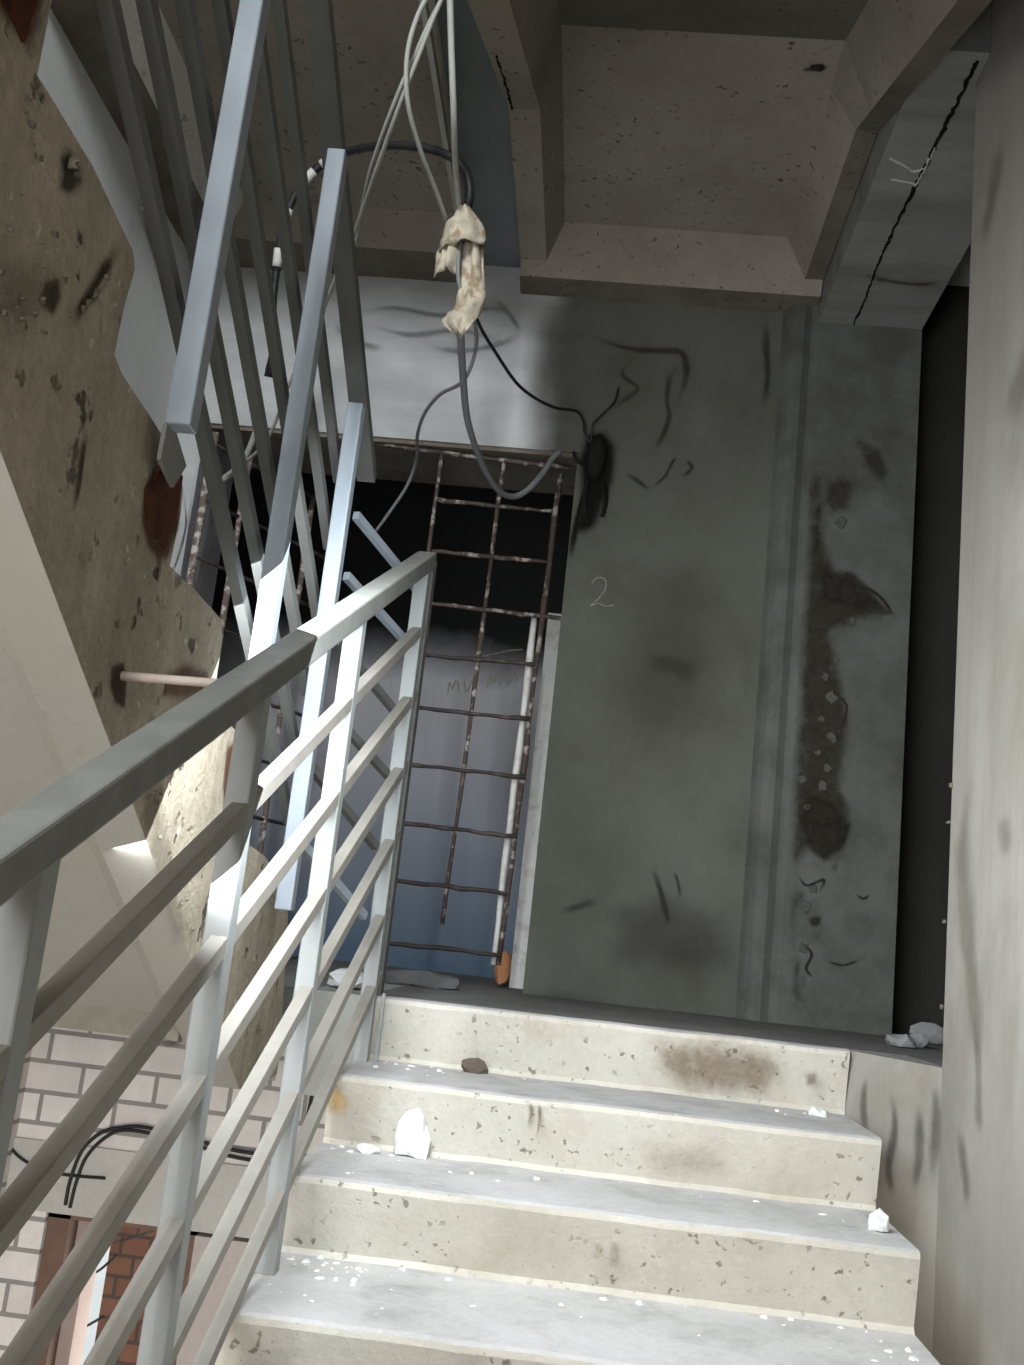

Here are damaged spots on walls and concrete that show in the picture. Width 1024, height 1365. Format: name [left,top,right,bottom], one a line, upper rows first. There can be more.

crack [853,60,979,326]
rust [143,501,180,577]
flaking render [795,480,891,974]